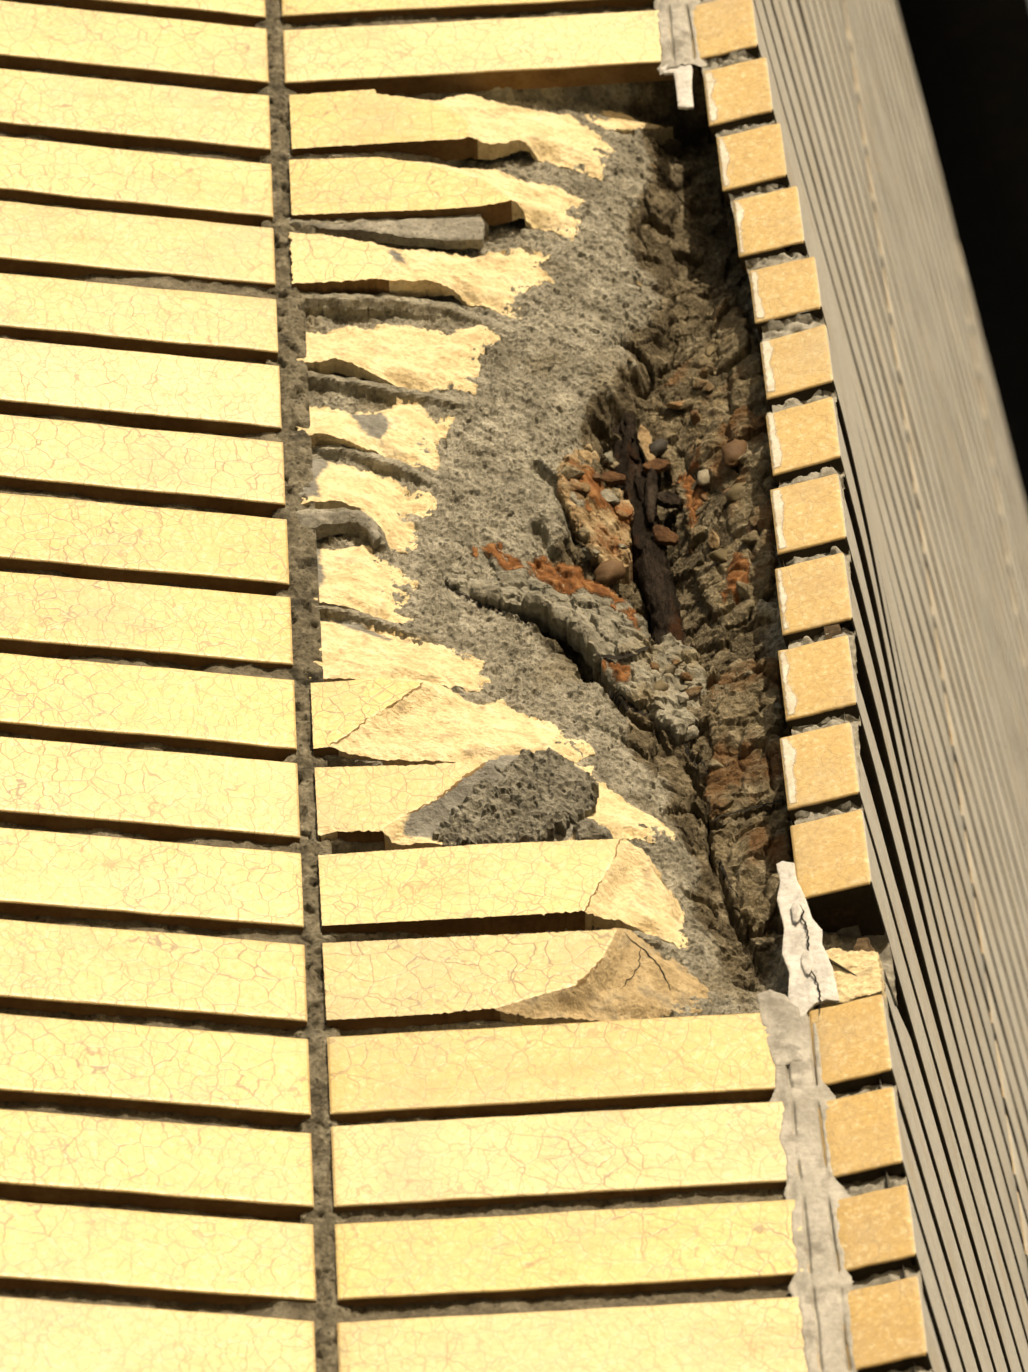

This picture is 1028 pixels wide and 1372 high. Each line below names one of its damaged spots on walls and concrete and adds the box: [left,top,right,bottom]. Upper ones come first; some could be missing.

rust [579,418,707,554]
crack [446,586,554,639]
rust [472,542,638,629]
rust [721,551,751,605]
rust [602,658,631,682]
spalling [281,64,1008,1372]
crack [583,645,785,897]
crack [619,934,671,991]